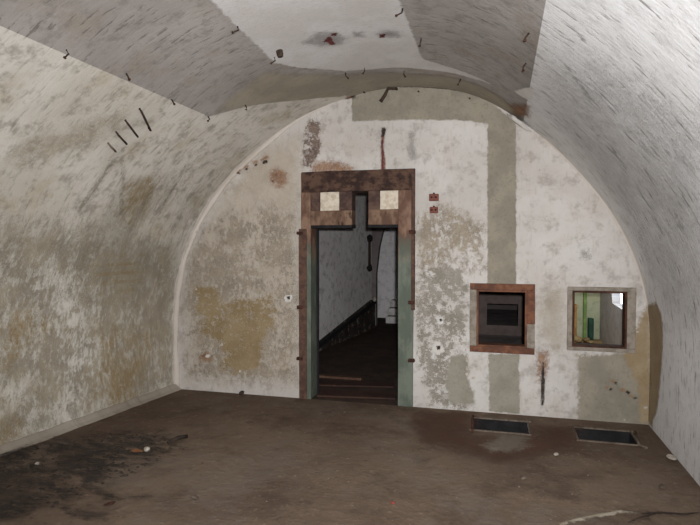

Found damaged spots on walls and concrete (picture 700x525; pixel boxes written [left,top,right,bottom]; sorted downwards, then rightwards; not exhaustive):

rust [301,30,348,48]
rust [309,158,354,172]
rust [269,166,290,190]
peeling [214,70,523,415]
peeling [0,198,301,443]